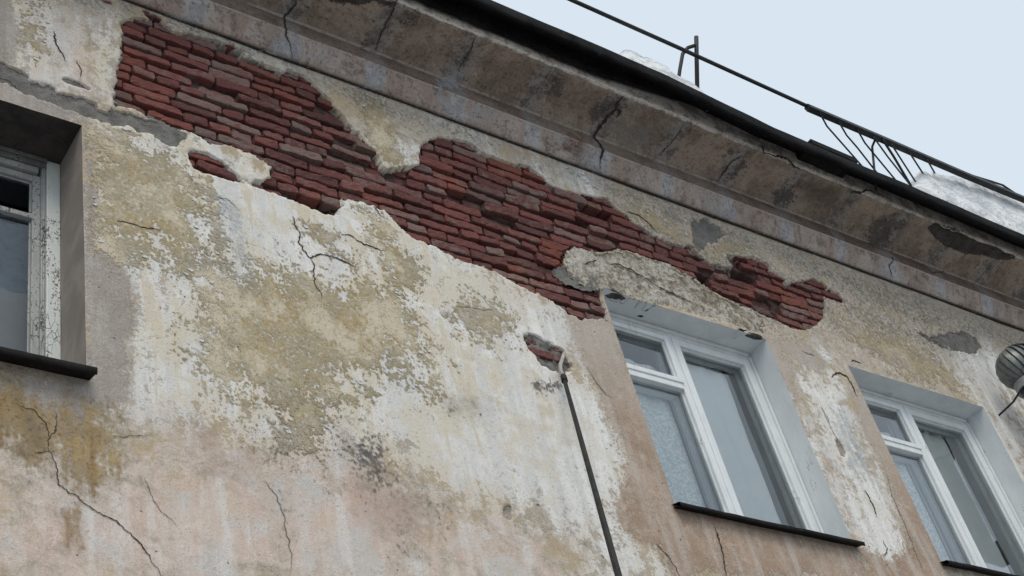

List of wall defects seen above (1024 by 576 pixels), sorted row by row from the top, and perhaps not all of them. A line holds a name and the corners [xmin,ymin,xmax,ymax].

crack [283,0,297,55]
crack [375,4,395,50]
crack [593,96,624,169]
crack [293,217,385,294]
flaking render [0,11,982,481]
spalling [927,223,1015,260]
crack [832,359,862,397]
crack [17,403,161,575]
crack [265,481,292,568]